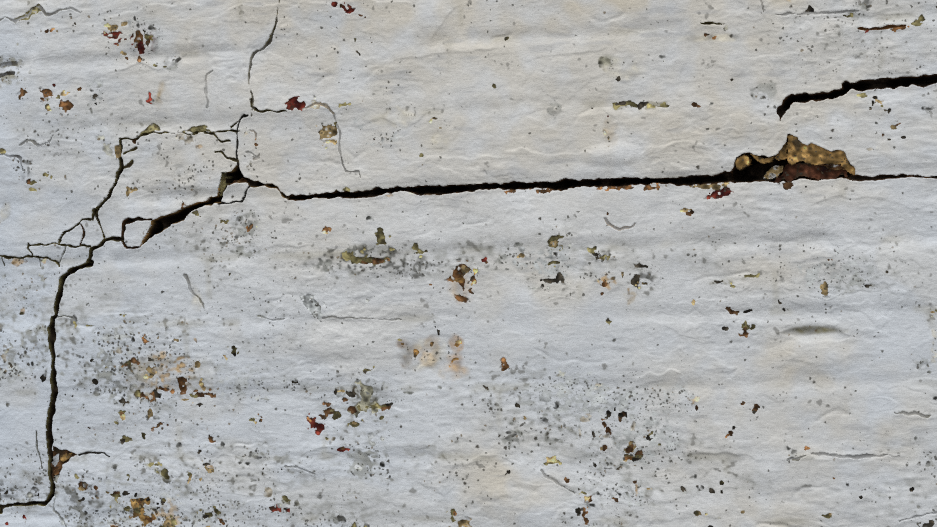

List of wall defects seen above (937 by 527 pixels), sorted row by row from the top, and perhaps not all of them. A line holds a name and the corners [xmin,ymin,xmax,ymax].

peeling [103,3,170,62]
crack [760,0,925,33]
crack [776,74,937,120]
spalling [731,134,855,190]
crack [846,173,937,181]
crack [0,0,743,527]
peeling [134,334,226,404]
peeling [120,422,169,445]
peeling [74,427,235,527]
peeling [306,366,393,452]
crack [787,446,900,461]